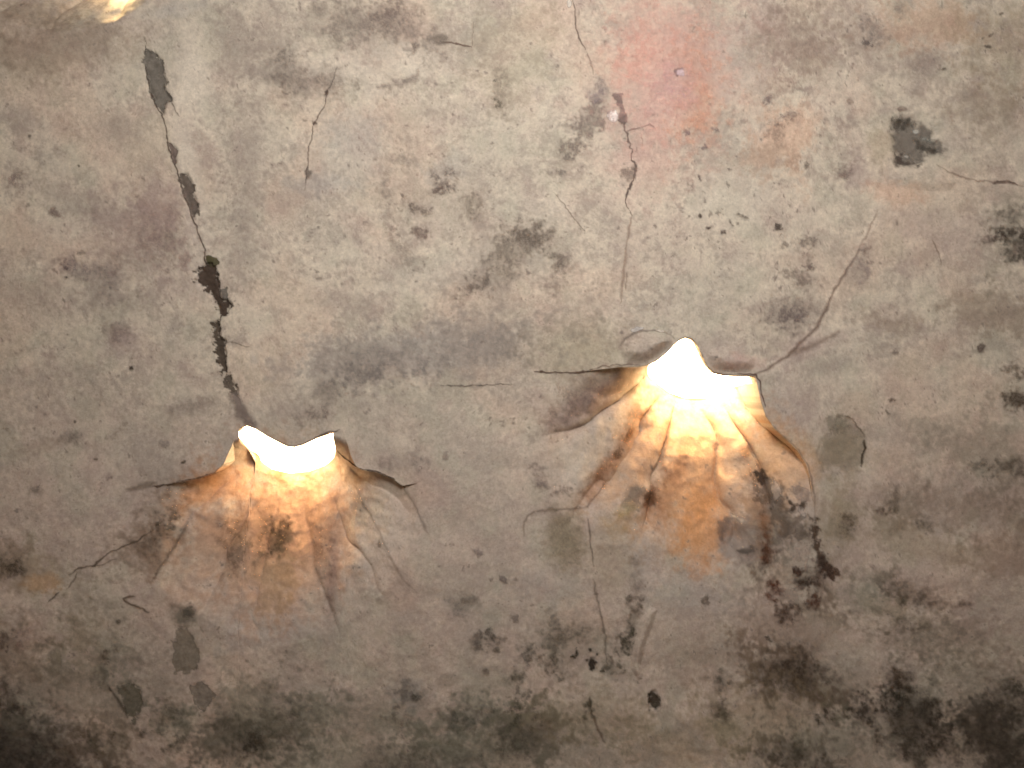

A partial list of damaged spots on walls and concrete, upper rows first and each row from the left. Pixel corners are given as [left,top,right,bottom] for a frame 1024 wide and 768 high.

crack [567,0,584,46]
crack [142,46,255,426]
crack [306,81,333,178]
crack [612,93,654,287]
spalling [891,119,943,166]
crack [740,275,844,407]
crack [48,537,142,602]
water stain [890,669,942,767]